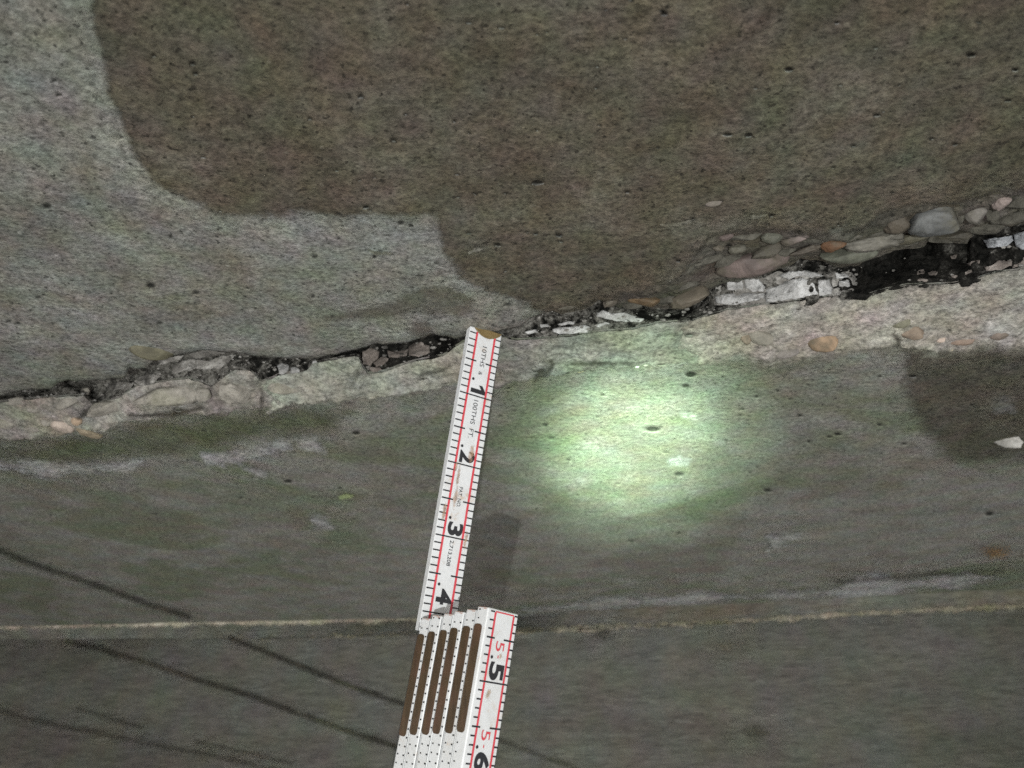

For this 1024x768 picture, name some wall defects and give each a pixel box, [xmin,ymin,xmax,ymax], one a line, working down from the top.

crack [0,334,465,419]
crack [495,283,744,379]
spalling [493,187,1024,389]
crack [756,224,1024,307]
damp [907,341,1024,460]